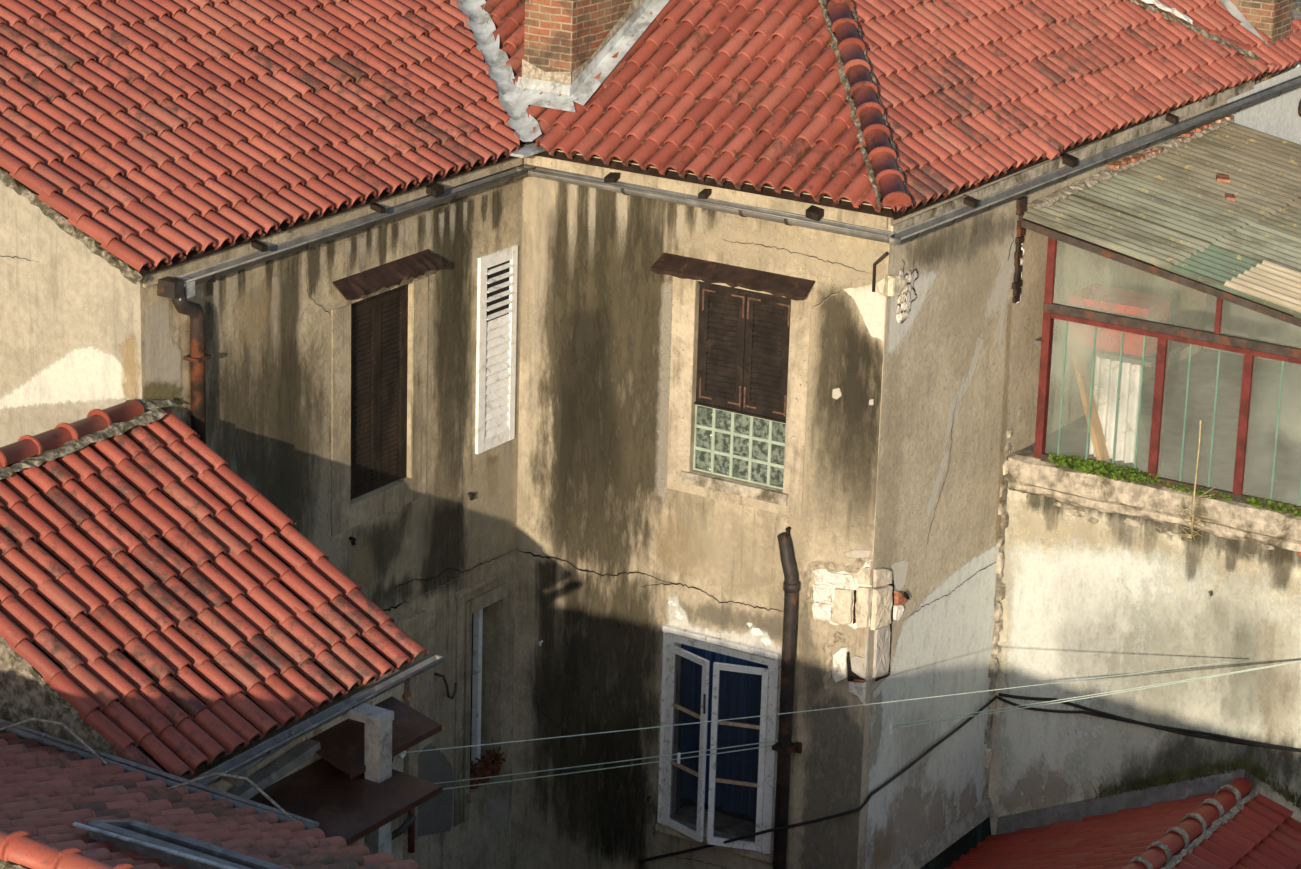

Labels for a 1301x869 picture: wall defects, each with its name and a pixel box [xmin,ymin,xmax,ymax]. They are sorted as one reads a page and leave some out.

peeling [843,268,937,354]
damp [205,191,501,570]
damp [373,501,464,606]
crack [383,548,781,612]
damp [531,181,883,869]
peeling [988,428,1013,694]
damp [1029,494,1126,517]
spalling [1123,518,1193,542]
damp [1144,518,1301,564]
spalling [807,550,910,706]
peeling [982,766,1071,812]
damp [1111,737,1301,795]